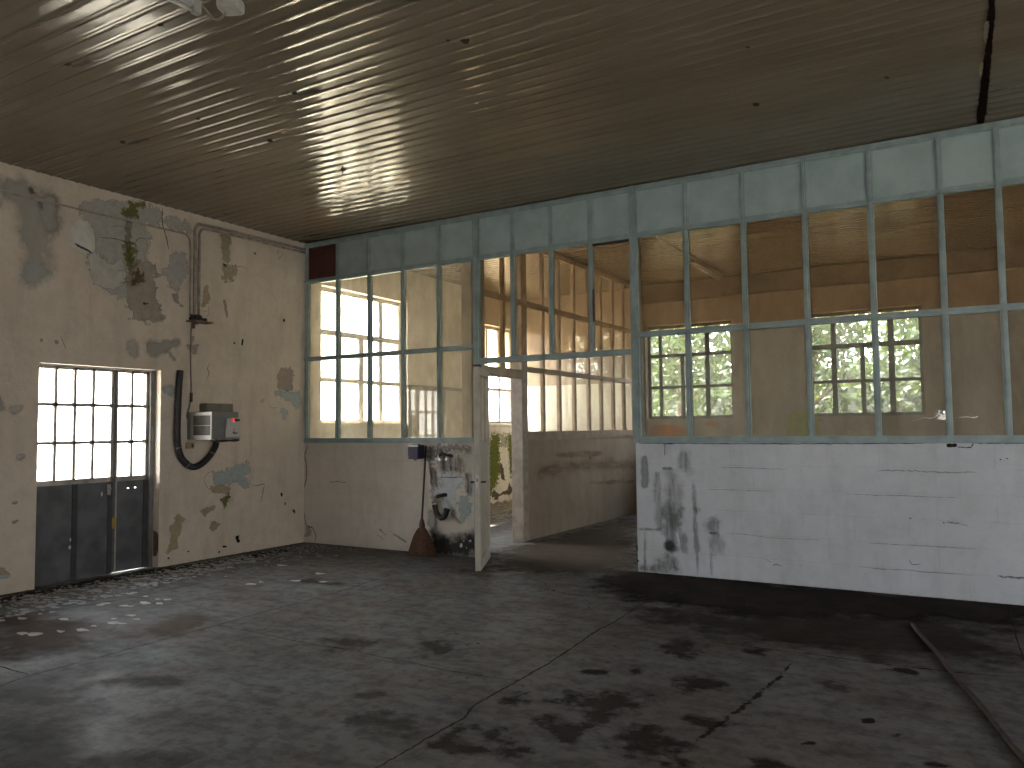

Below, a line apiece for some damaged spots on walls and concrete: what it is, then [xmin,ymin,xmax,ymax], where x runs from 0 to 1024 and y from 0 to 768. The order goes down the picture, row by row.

peeling [78,198,189,326]
peeling [220,234,245,283]
peeling [129,336,199,361]
peeling [260,367,301,420]
flaking render [153,514,189,559]
peeling [200,444,251,531]
damp [427,443,472,493]
damp [429,511,475,557]
damp [641,453,719,571]
crack [0,572,1024,768]